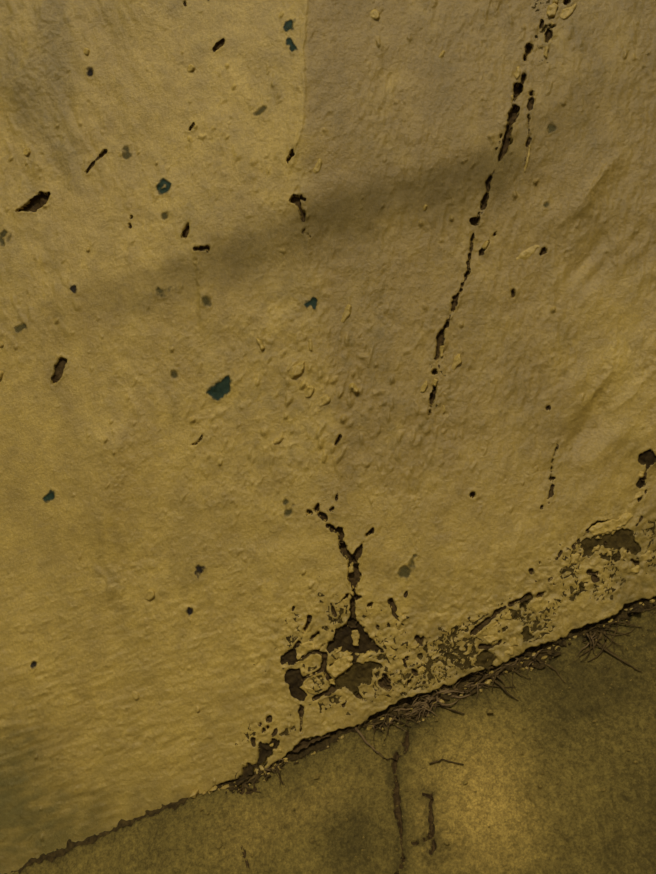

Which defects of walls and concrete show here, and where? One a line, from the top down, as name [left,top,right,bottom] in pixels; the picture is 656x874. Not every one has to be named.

crack [420,0,577,414]
crack [307,493,374,628]
peeling [235,512,656,782]
crack [241,845,249,868]
crack [391,708,436,874]